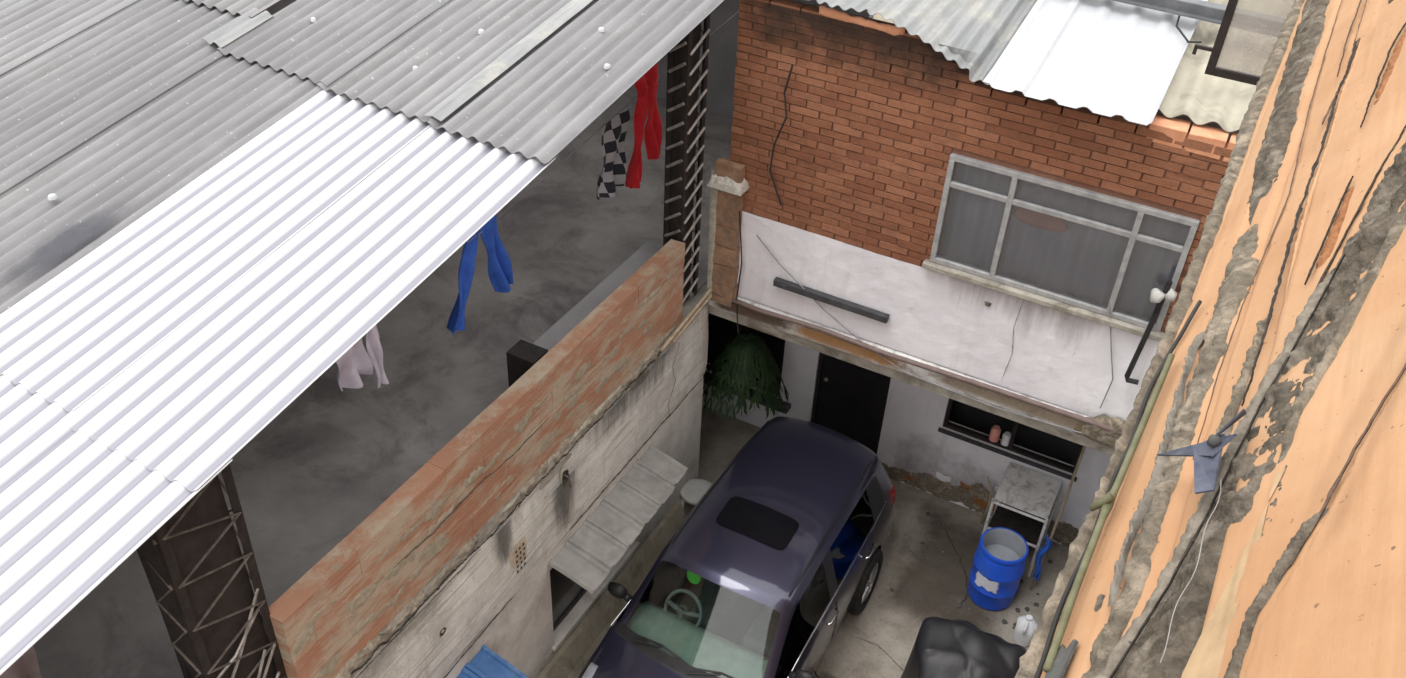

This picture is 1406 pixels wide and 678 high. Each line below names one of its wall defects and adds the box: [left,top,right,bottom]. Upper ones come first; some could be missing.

damp [12,215,112,275]
damp [497,520,511,560]
spalling [335,325,676,678]
peeling [882,454,999,517]
spalling [1015,0,1305,678]
spalling [1109,125,1406,678]